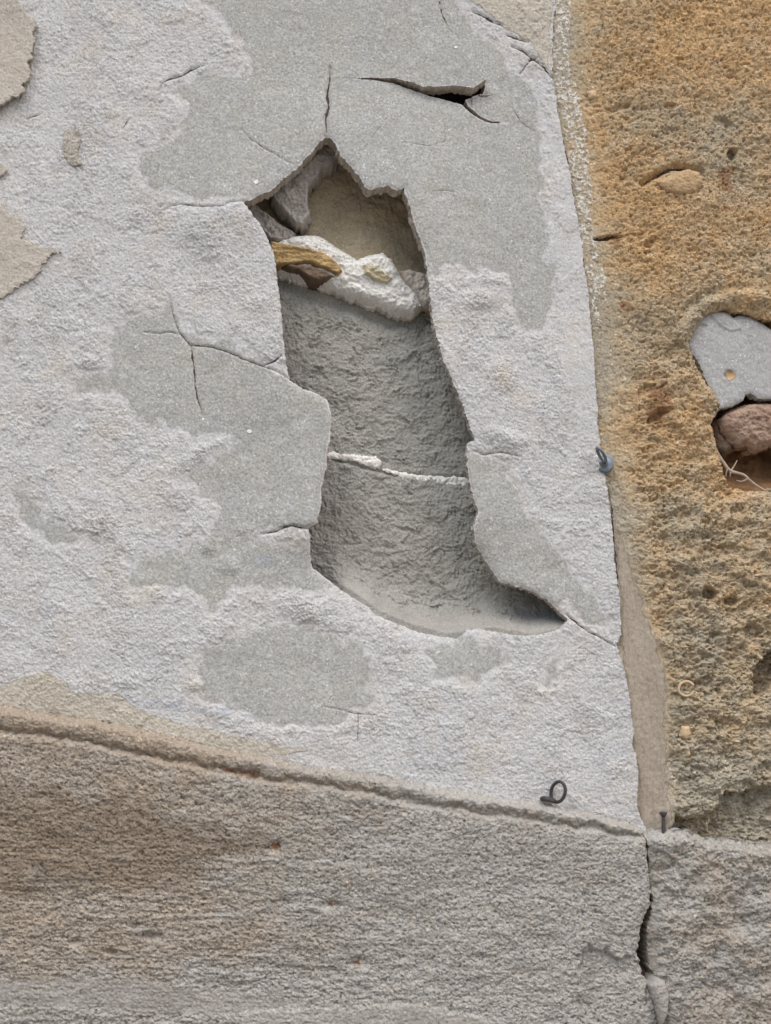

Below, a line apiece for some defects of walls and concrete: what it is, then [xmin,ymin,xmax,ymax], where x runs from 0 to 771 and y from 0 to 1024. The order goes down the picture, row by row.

peeling [0,0,37,106]
crack [428,89,494,105]
crack [151,306,290,415]
spalling [76,0,604,681]
spalling [697,308,771,329]
spalling [713,396,771,420]
spalling [720,448,771,492]
crack [636,896,650,976]